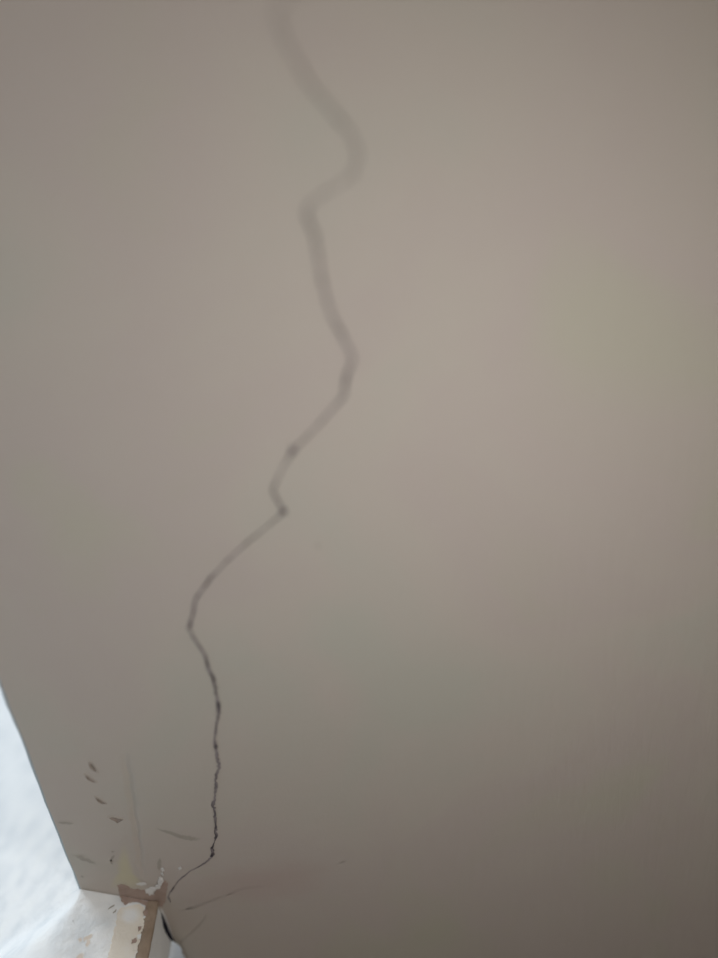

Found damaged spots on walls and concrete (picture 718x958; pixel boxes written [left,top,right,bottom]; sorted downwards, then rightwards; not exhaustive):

peeling [108,857,168,958]
crack [160,0,360,943]